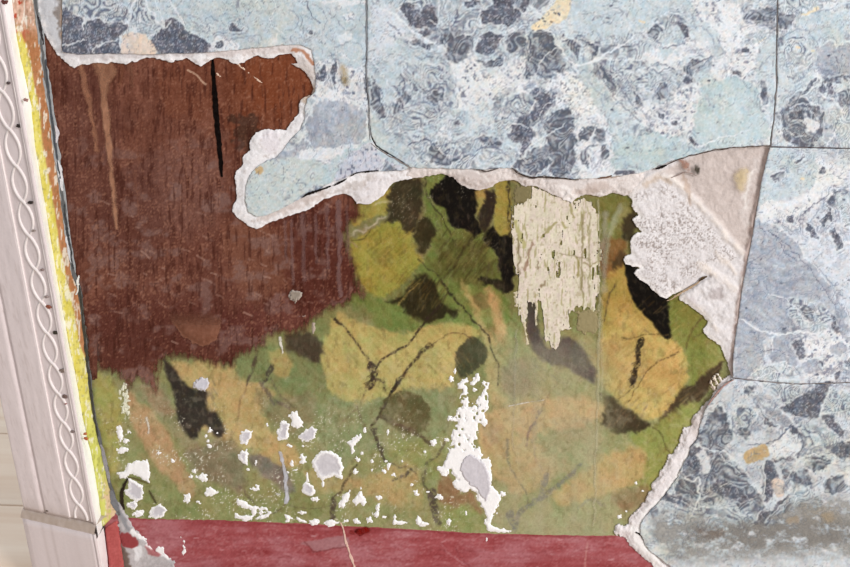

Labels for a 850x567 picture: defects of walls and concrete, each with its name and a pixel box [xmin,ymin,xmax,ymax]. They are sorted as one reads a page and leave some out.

crack [211,59,223,177]
flaking render [38,0,412,229]
flaking render [406,138,772,567]
peeling [118,383,131,416]
peeling [193,377,209,391]
peeling [116,425,131,454]
peeling [238,429,257,471]
peeling [276,411,396,502]
flaking render [115,459,175,567]
peeling [183,469,219,504]
peeling [235,499,272,522]
peeling [284,487,429,527]